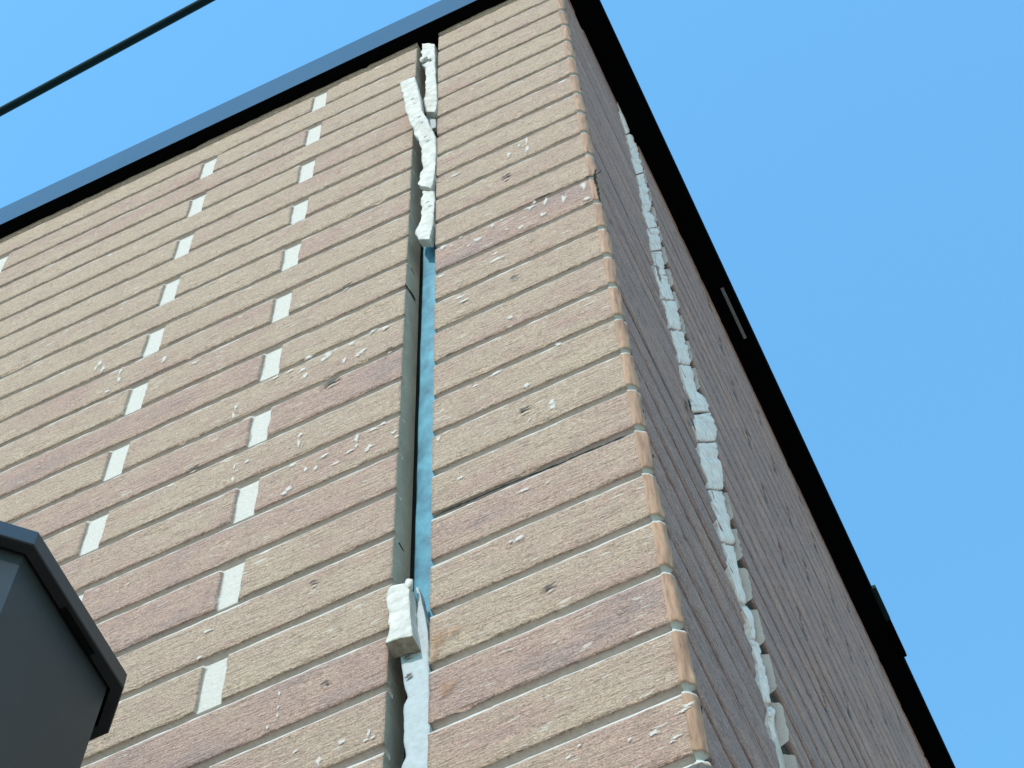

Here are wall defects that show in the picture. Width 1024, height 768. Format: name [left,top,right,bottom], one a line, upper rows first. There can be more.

crack [433,429,641,518]
peeling [616,102,777,743]